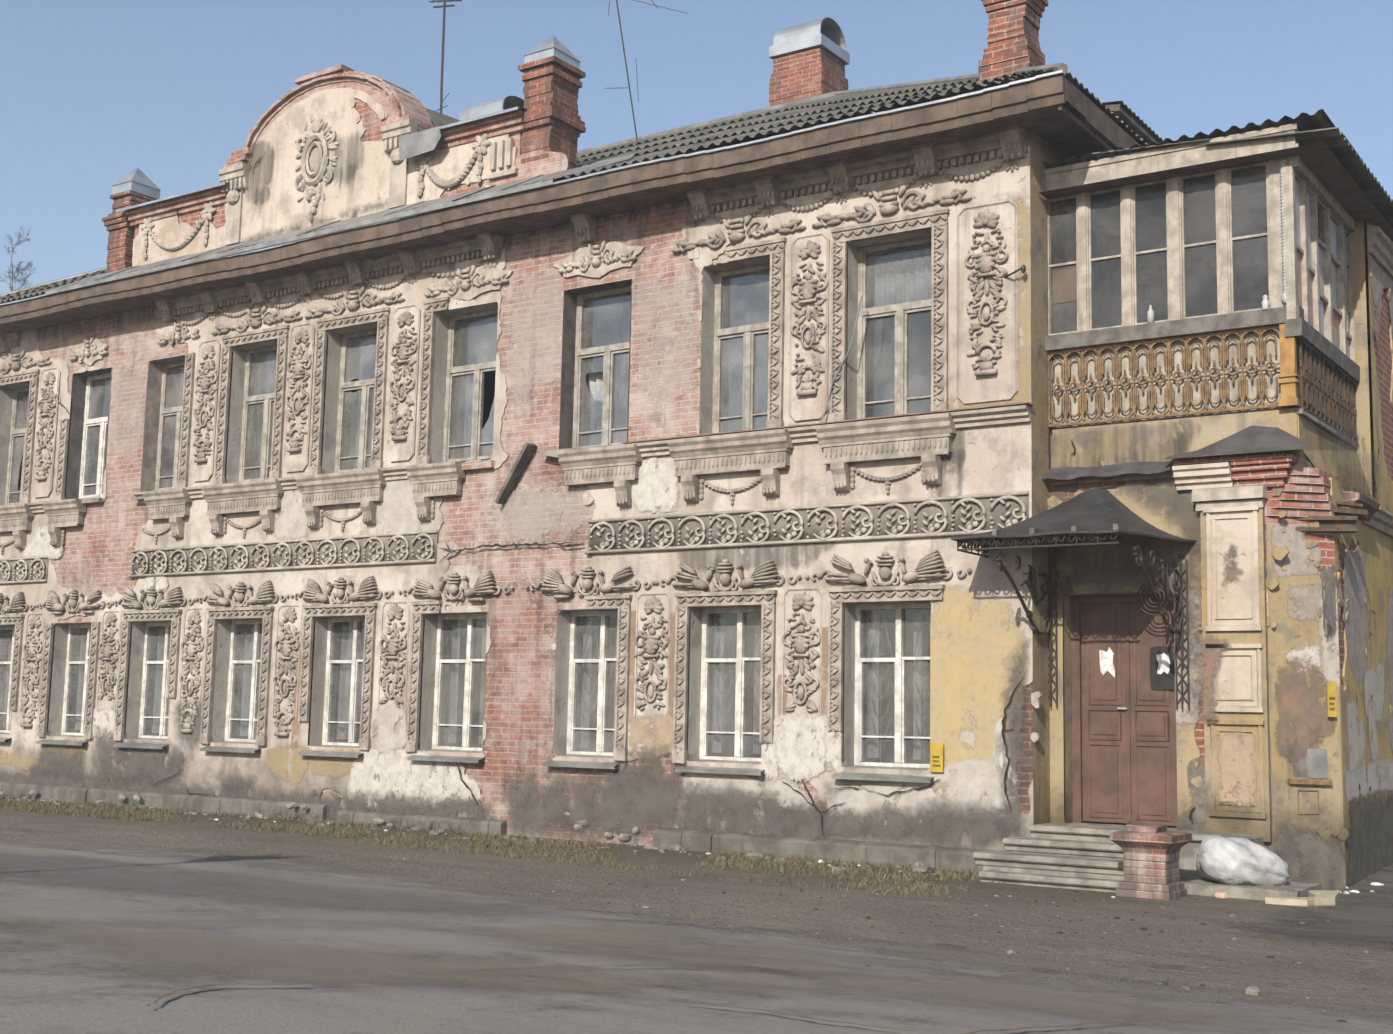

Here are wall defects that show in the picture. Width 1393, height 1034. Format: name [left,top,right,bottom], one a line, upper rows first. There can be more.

flaking render [1368,250,1393,482]
peeling [1265,486,1368,689]
leakage [0,703,492,821]
leakage [683,655,1026,849]
crack [782,779,941,836]
crack [1001,675,1025,813]
leakage [1275,658,1335,762]
leakage [1265,793,1393,890]